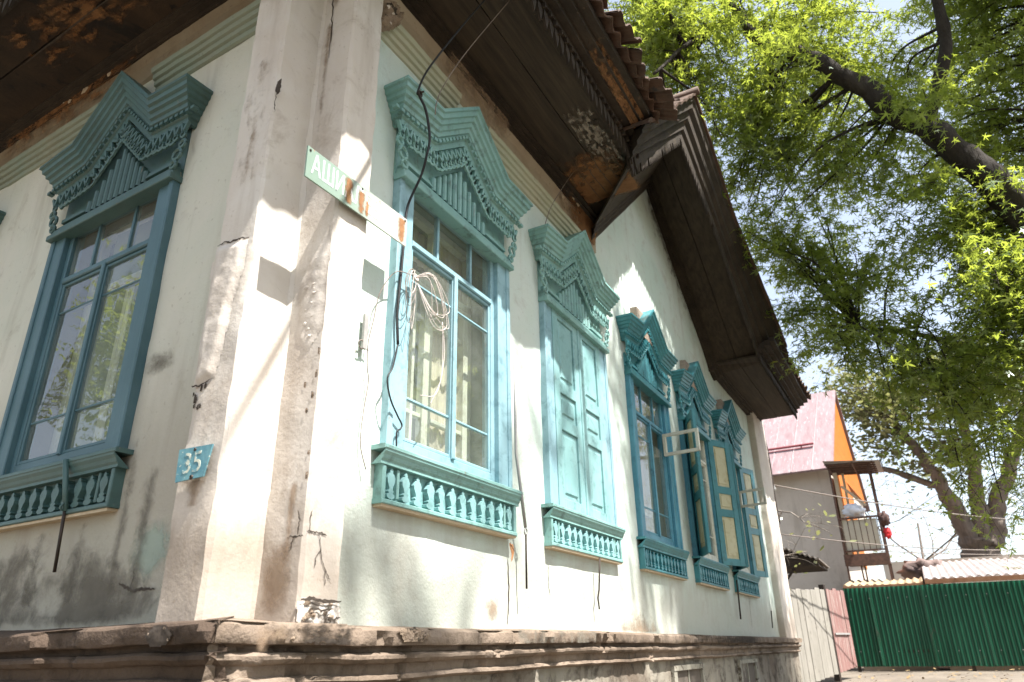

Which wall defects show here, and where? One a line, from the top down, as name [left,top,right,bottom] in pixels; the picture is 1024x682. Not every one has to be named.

peeling [12,0,135,65]
crack [327,1,335,49]
peeling [568,109,622,162]
leakage [0,553,33,623]
leakage [54,552,149,625]
crack [119,568,155,593]
crack [287,510,330,586]
spalling [271,596,353,645]